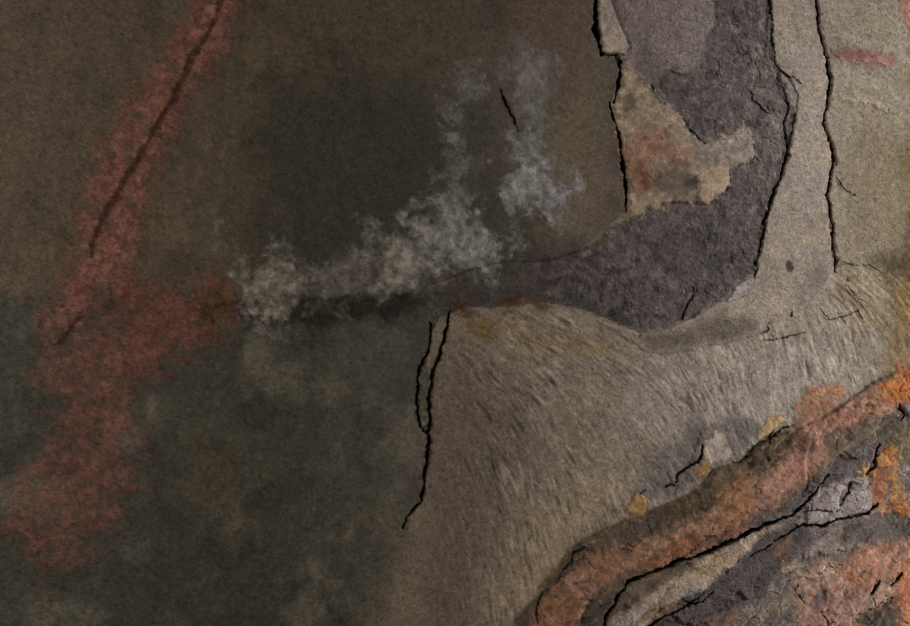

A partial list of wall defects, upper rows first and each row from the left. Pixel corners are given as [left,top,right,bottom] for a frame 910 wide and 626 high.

crack [91,0,224,257]
damp [228,259,319,334]
damp [334,194,502,301]
crack [500,90,518,131]
damp [499,128,583,230]
spalling [502,0,796,331]
crack [815,0,881,320]
crack [403,313,449,528]
crack [535,547,586,622]
rust [515,364,910,626]
crack [603,444,881,626]
crack [732,426,790,463]